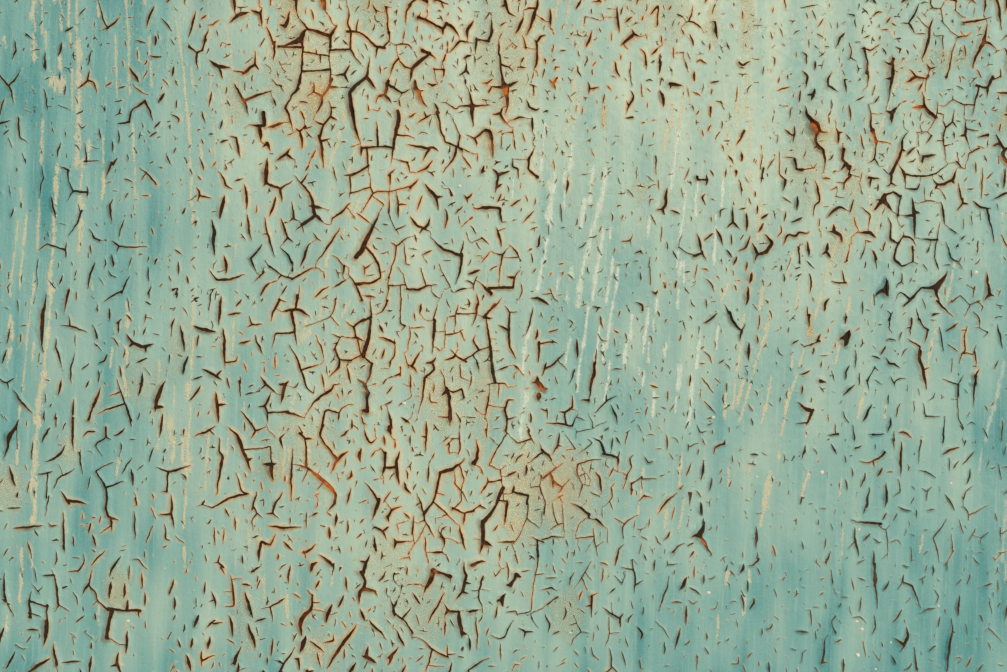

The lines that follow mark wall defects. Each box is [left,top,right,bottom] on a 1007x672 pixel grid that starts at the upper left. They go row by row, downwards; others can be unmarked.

crack [0,0,781,672]
crack [581,0,1007,672]